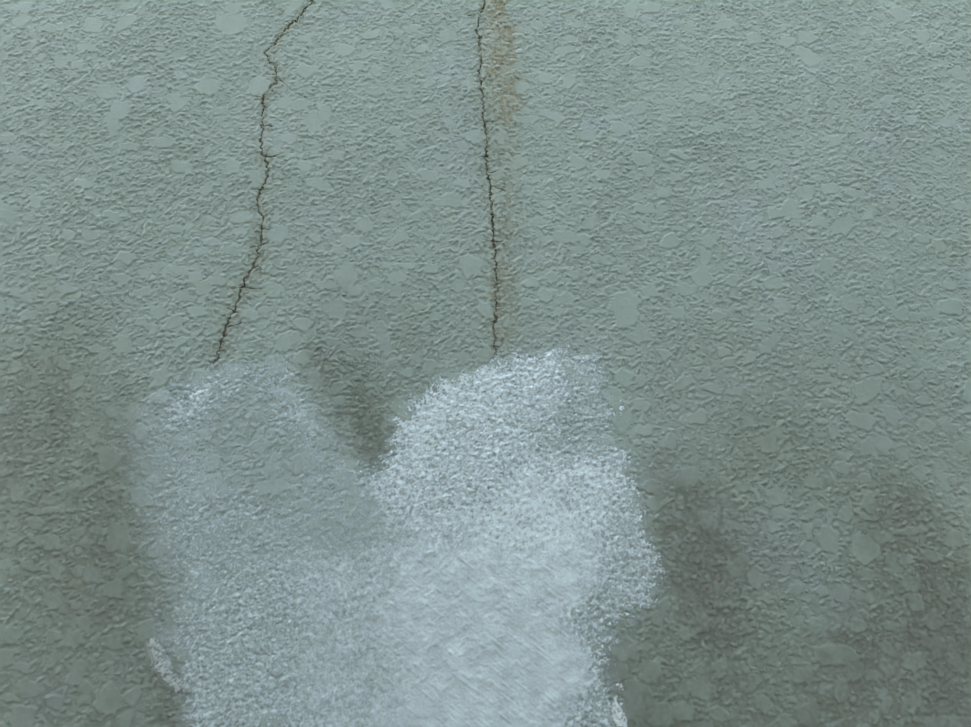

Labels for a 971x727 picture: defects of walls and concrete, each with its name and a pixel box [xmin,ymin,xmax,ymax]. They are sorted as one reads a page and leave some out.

crack [212,0,314,366]
crack [468,0,507,355]